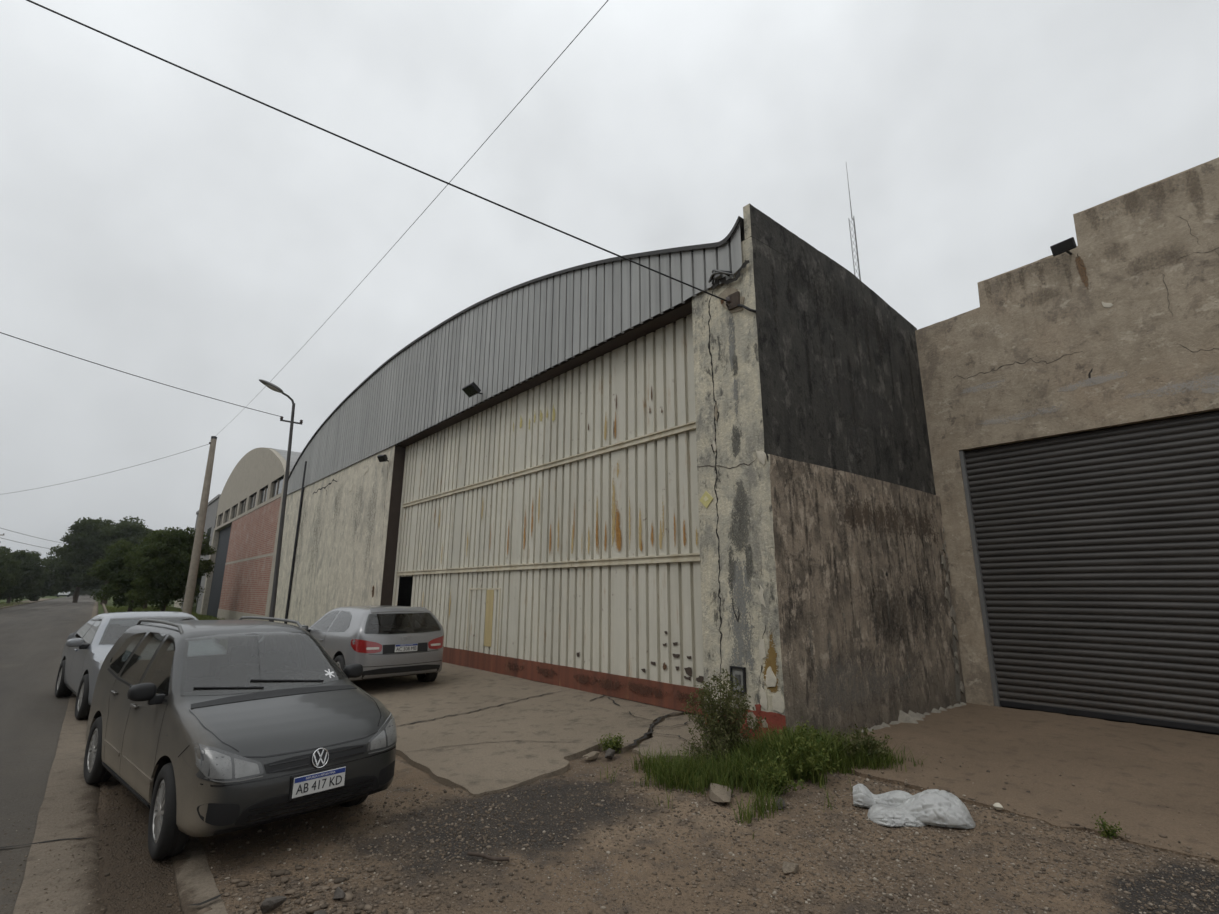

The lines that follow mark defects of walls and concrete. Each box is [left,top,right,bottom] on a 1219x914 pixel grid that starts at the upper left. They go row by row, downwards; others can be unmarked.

crack [1075,253,1089,289]
crack [1161,217,1219,352]
crack [953,351,1096,384]
corrosion [507,460,698,556]
crack [698,260,755,681]
peeling [738,625,785,729]